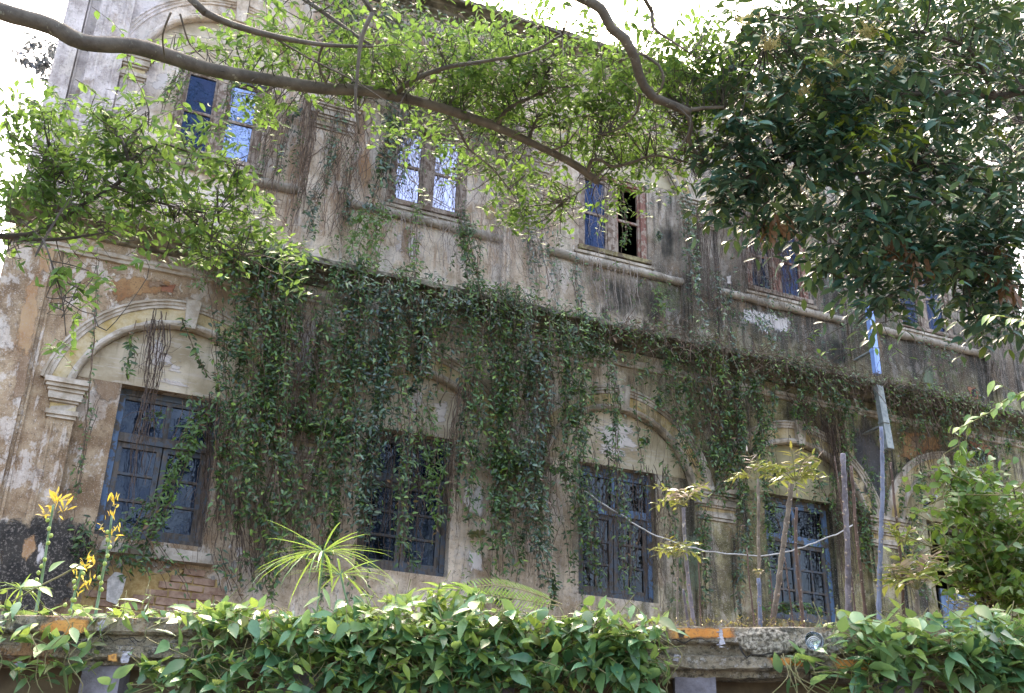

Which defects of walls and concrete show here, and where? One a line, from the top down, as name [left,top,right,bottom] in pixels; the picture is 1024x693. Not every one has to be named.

peeling [106,273,183,304]
peeling [742,309,788,334]
mould [0,515,93,615]
spalling [75,541,225,635]